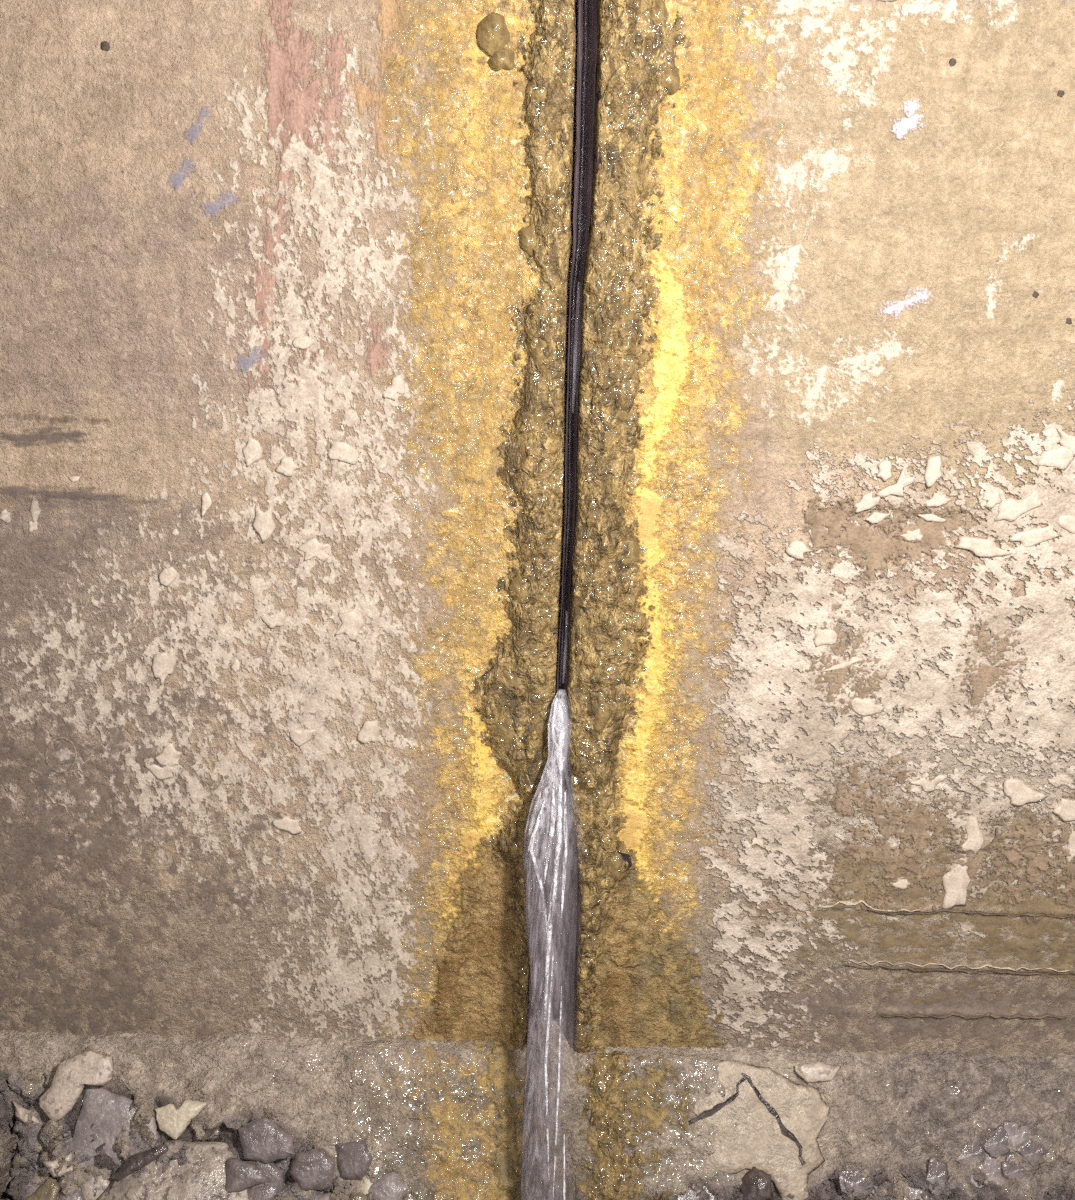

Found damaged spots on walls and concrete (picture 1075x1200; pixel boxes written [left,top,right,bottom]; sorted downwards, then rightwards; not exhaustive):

damp [759,135,870,229]
damp [743,238,912,426]
damp [0,0,738,1200]
damp [802,789,907,830]
peeling [694,387,1075,1053]
damp [735,809,1075,1055]
crack [691,1073,806,1164]